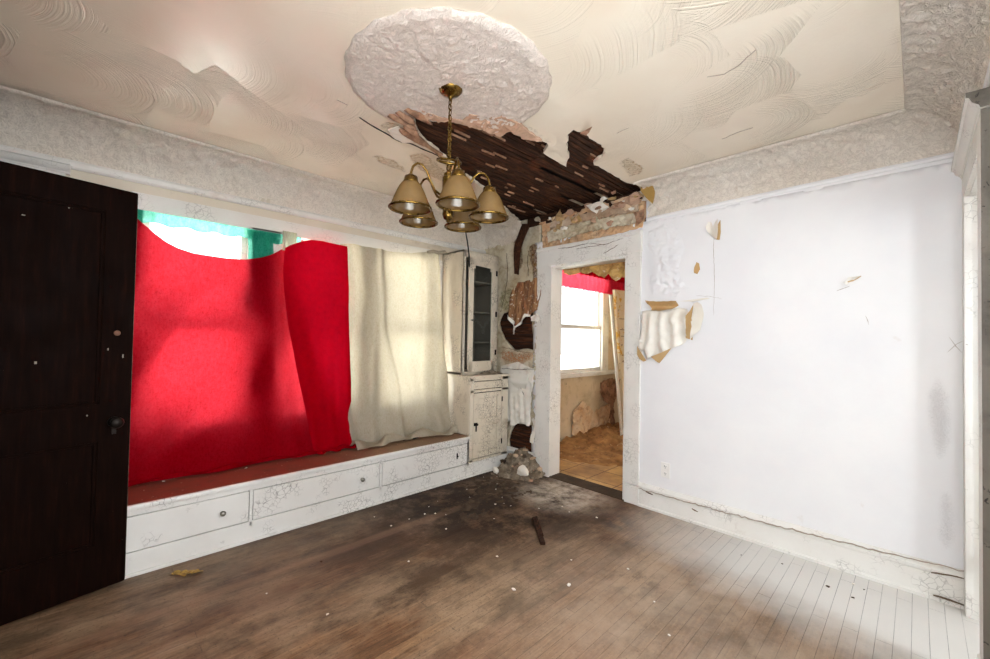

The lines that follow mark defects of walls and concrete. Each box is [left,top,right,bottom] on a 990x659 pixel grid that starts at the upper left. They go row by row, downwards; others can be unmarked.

crack [337,100,439,157]
flaking render [387,108,655,248]
peeling [500,278,541,350]
spalling [510,418,536,452]
crack [638,488,964,606]